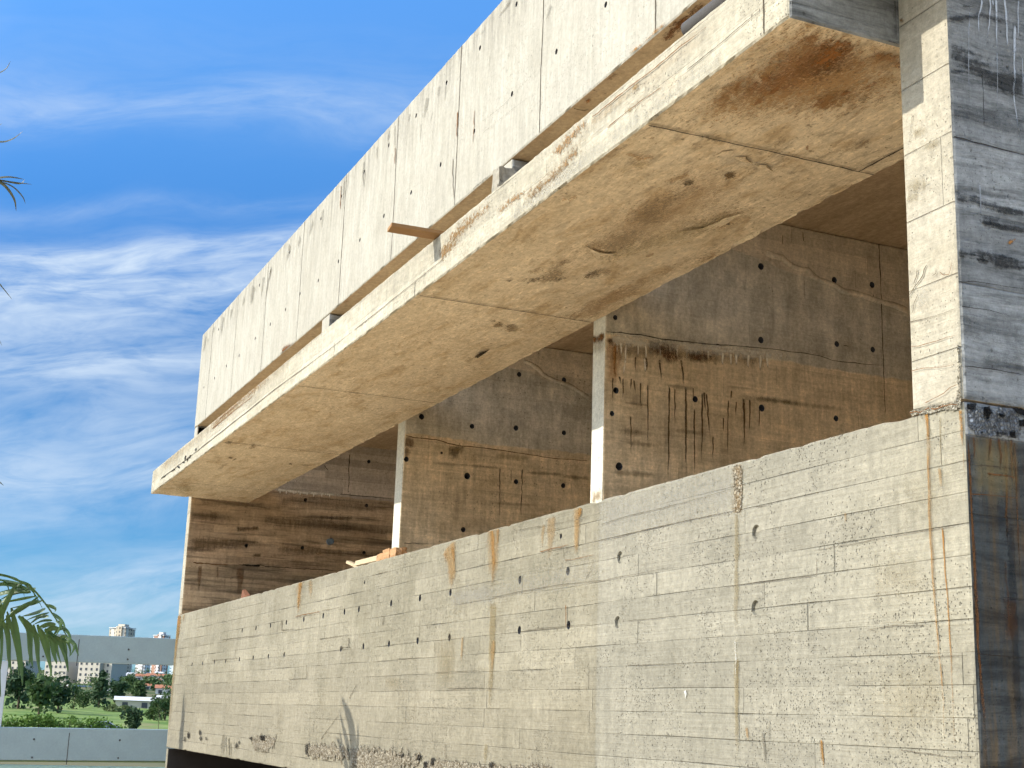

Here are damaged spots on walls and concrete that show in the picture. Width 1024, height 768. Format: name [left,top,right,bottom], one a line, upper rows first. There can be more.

damp [612,337,782,467]
corrosion [927,454,952,682]